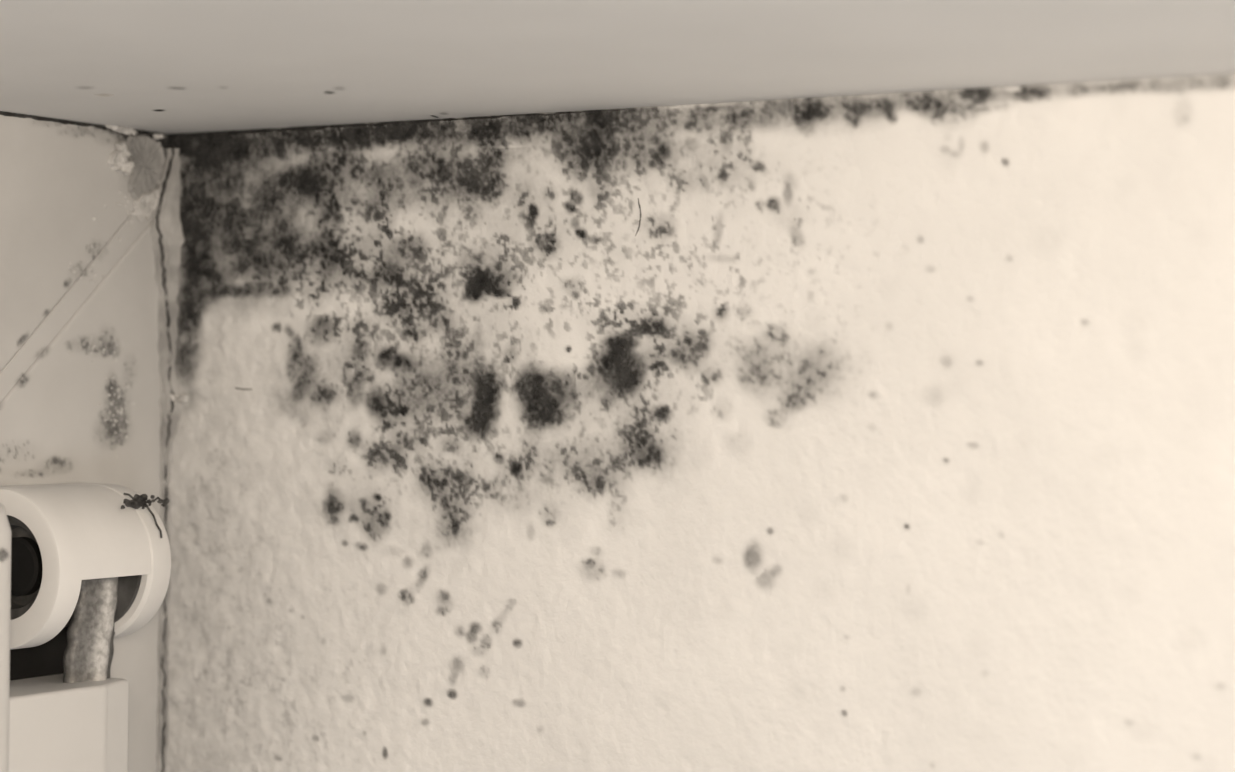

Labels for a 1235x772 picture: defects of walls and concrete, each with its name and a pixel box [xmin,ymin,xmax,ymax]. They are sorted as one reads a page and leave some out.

water stain [795,102,827,121]
water stain [915,97,942,116]
water stain [1015,87,1046,97]
water stain [110,108,658,359]
water stain [379,350,410,367]
water stain [602,322,690,394]
water stain [369,395,403,424]
water stain [465,371,500,436]
water stain [518,371,564,426]
water stain [629,425,658,463]
water stain [422,475,459,534]